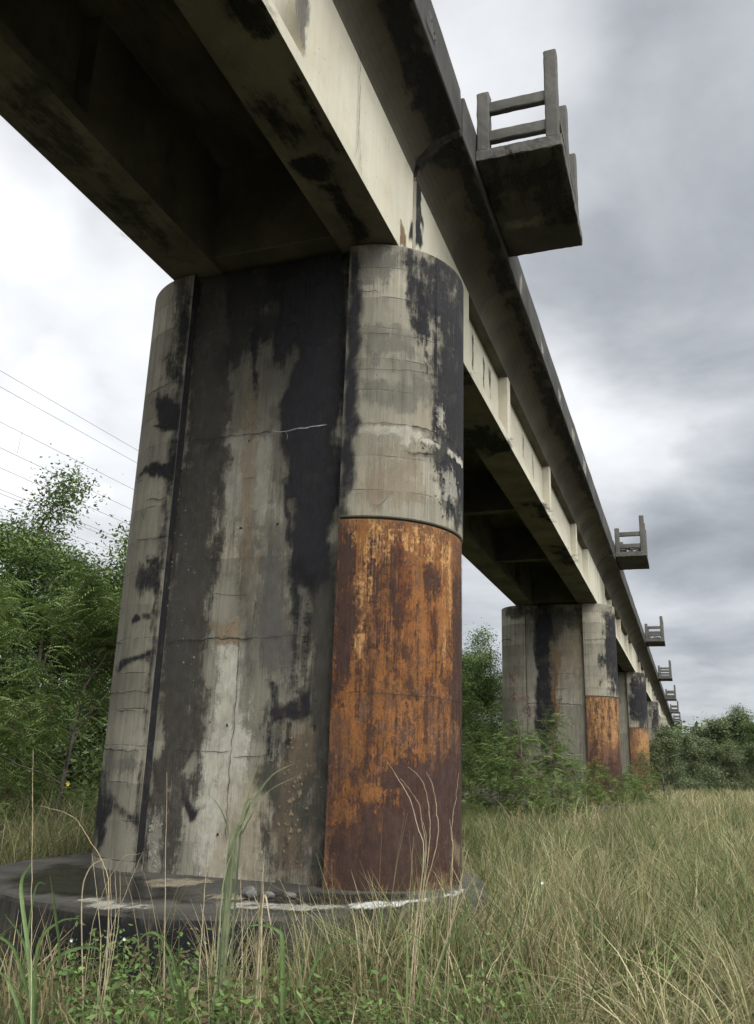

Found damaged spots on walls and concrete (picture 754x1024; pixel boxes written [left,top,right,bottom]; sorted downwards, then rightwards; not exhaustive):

leakage [5,76,467,1001]
crack [152,420,327,450]
rust [323,519,462,892]
leakage [374,0,595,532]
leakage [506,605,582,771]
rust [586,697,650,805]